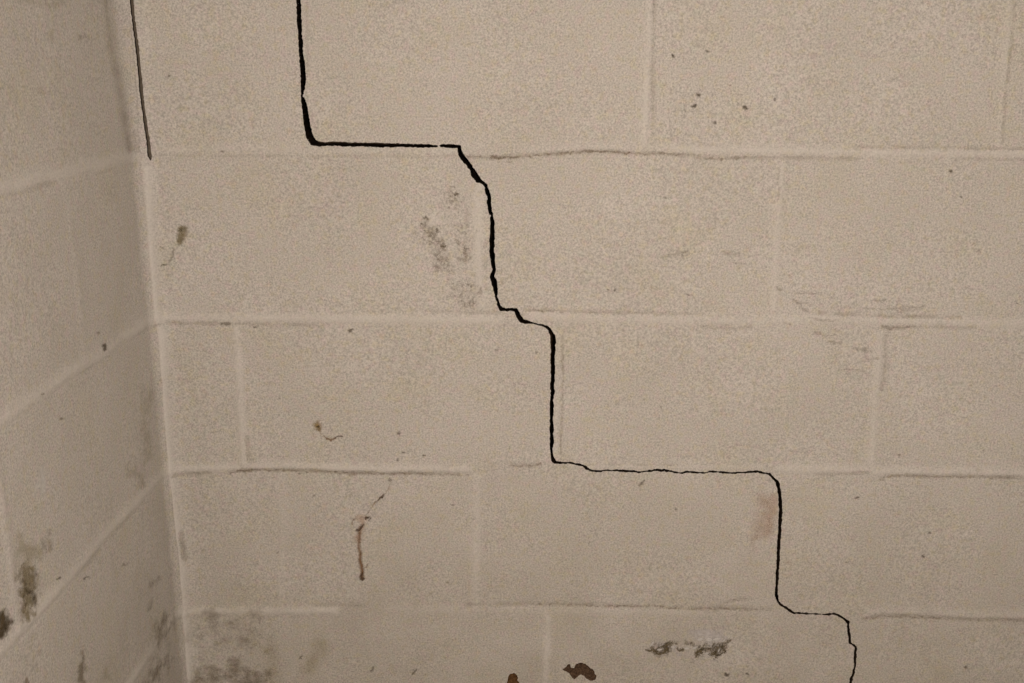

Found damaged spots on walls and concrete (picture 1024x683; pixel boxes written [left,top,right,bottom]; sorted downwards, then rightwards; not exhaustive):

crack [296,0,857,683]
corrosion [353,517,371,581]
leakage [0,611,13,638]
leakage [20,568,36,620]